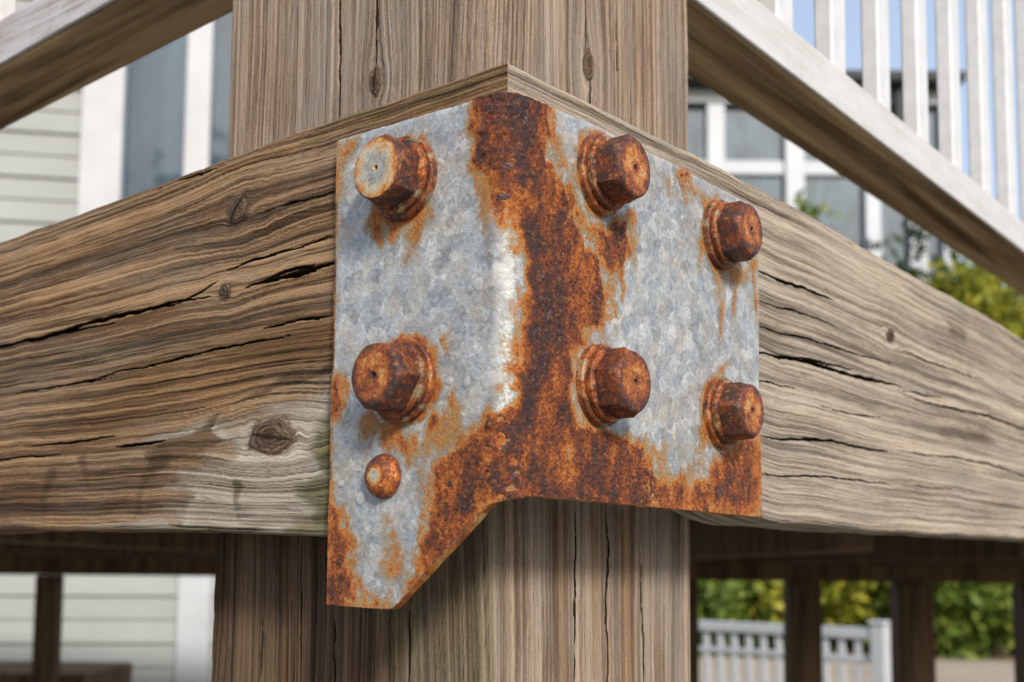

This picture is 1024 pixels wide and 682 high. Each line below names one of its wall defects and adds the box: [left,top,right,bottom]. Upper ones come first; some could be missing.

crack [0,234,336,349]
corrosion [326,92,762,609]
crack [758,271,1024,430]
crack [765,473,887,484]
crack [760,435,1024,476]
crack [571,512,579,682]
crack [603,507,611,682]
crack [638,563,646,682]